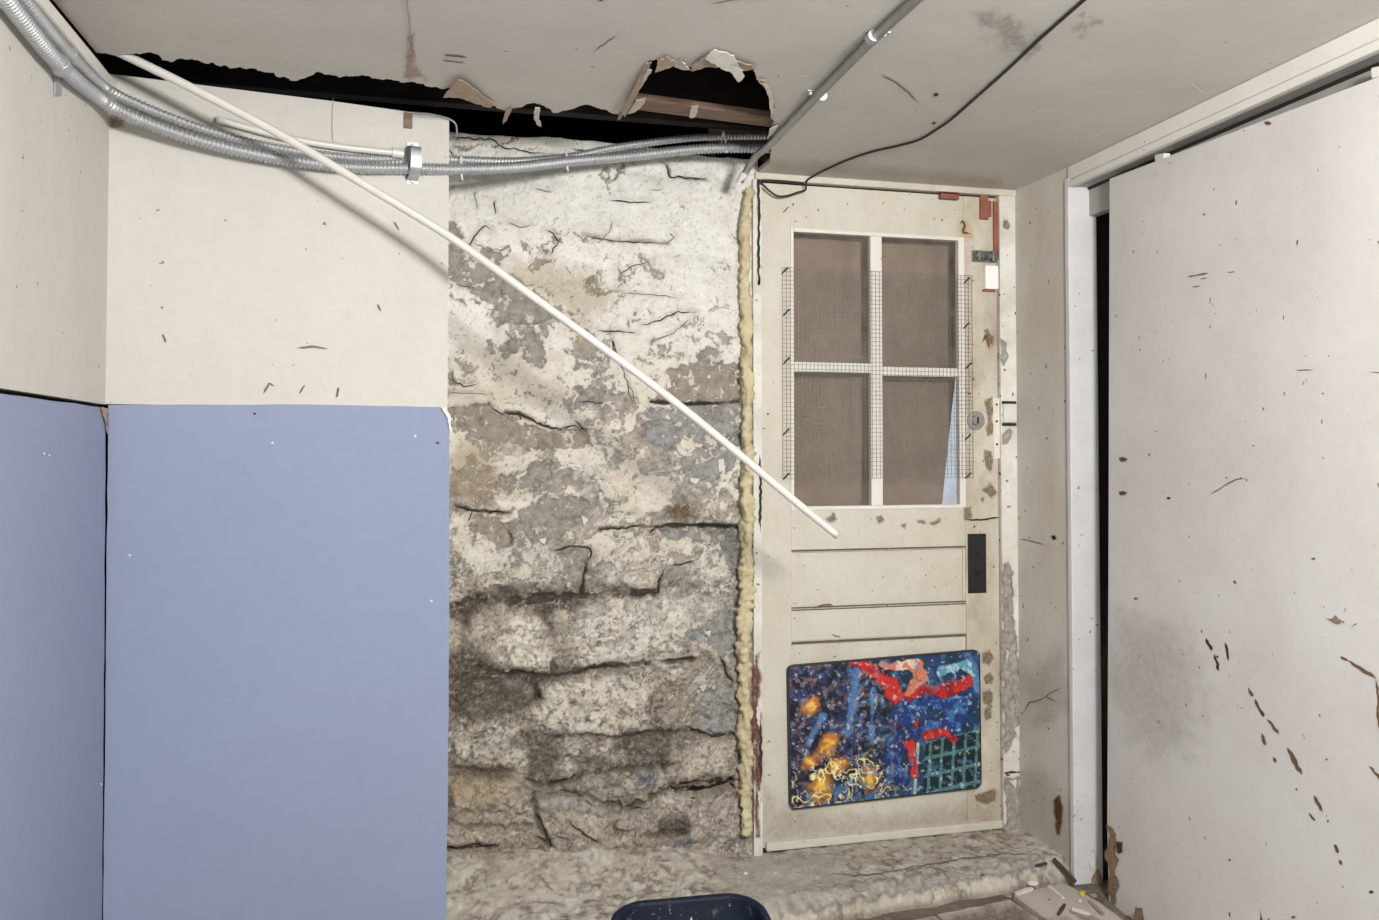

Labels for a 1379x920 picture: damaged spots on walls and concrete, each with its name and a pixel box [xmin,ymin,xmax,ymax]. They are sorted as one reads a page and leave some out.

crack [406,0,416,68]
peeling [617,55,718,120]
spalling [982,563,1020,752]
peeling [1089,825,1122,905]
peeling [1132,908,1144,920]